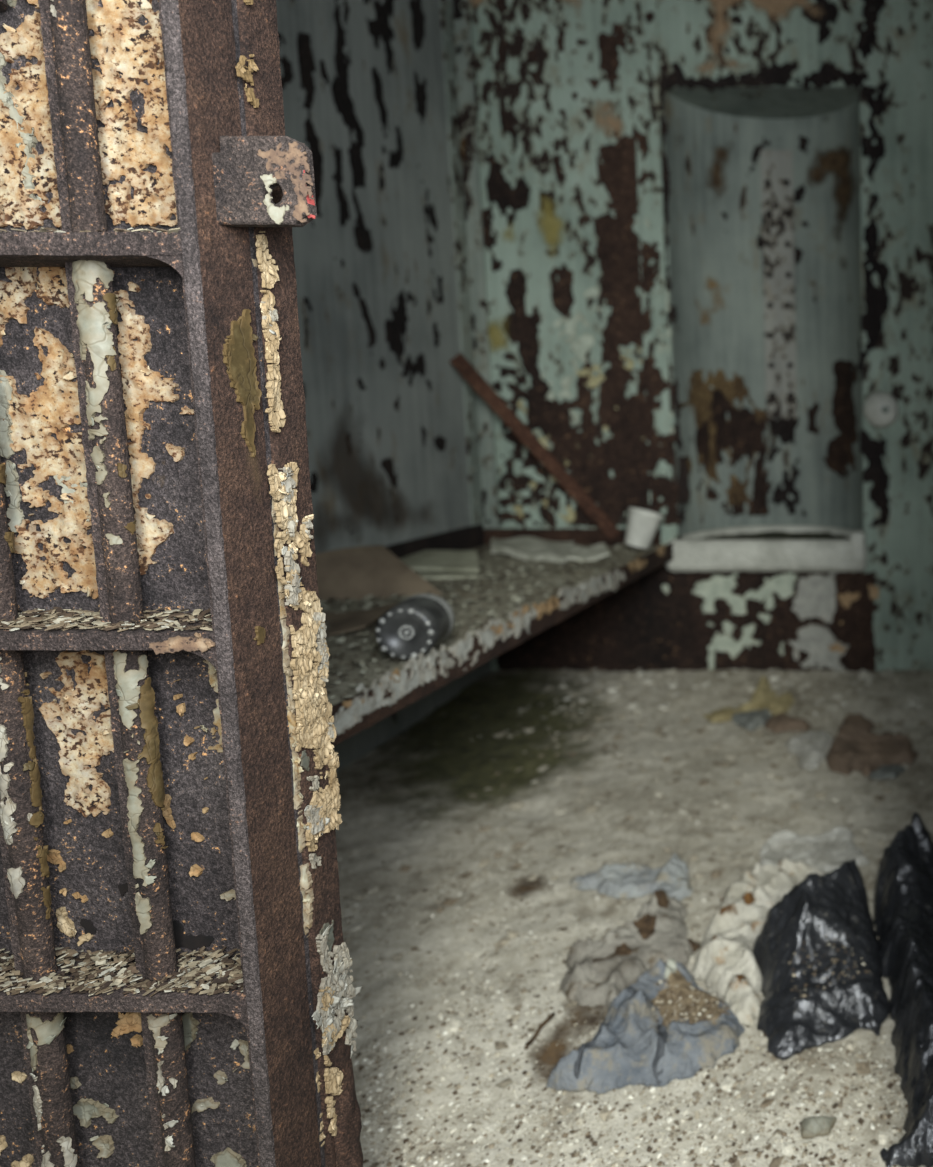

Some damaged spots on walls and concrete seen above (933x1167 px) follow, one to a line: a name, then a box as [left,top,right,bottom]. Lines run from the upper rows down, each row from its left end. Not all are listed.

peeling [0,0,62,230]
peeling [0,260,194,607]
peeling [86,0,178,228]
peeling [223,231,286,457]
rust [256,141,314,223]
peeling [278,0,373,254]
peeling [364,0,404,171]
peeling [352,282,432,391]
peeling [409,0,425,51]
peeling [464,0,891,529]
peeling [0,632,223,950]
peeling [267,462,880,1147]